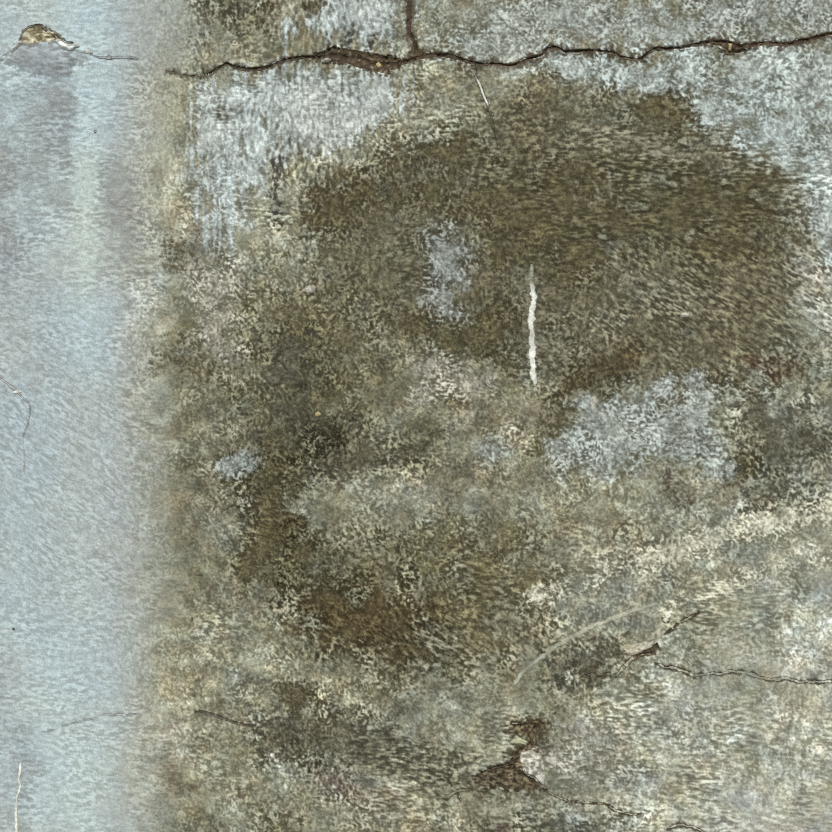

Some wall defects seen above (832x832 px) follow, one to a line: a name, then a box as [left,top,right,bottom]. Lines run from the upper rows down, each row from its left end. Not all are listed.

spalling [10,23,92,53]
crack [83,51,138,59]
crack [165,0,832,147]
damp [221,64,832,692]
crack [0,378,31,473]
crack [579,611,832,685]
crack [488,758,519,770]
spalling [472,712,556,791]
crack [542,788,642,816]
crack [667,822,705,832]